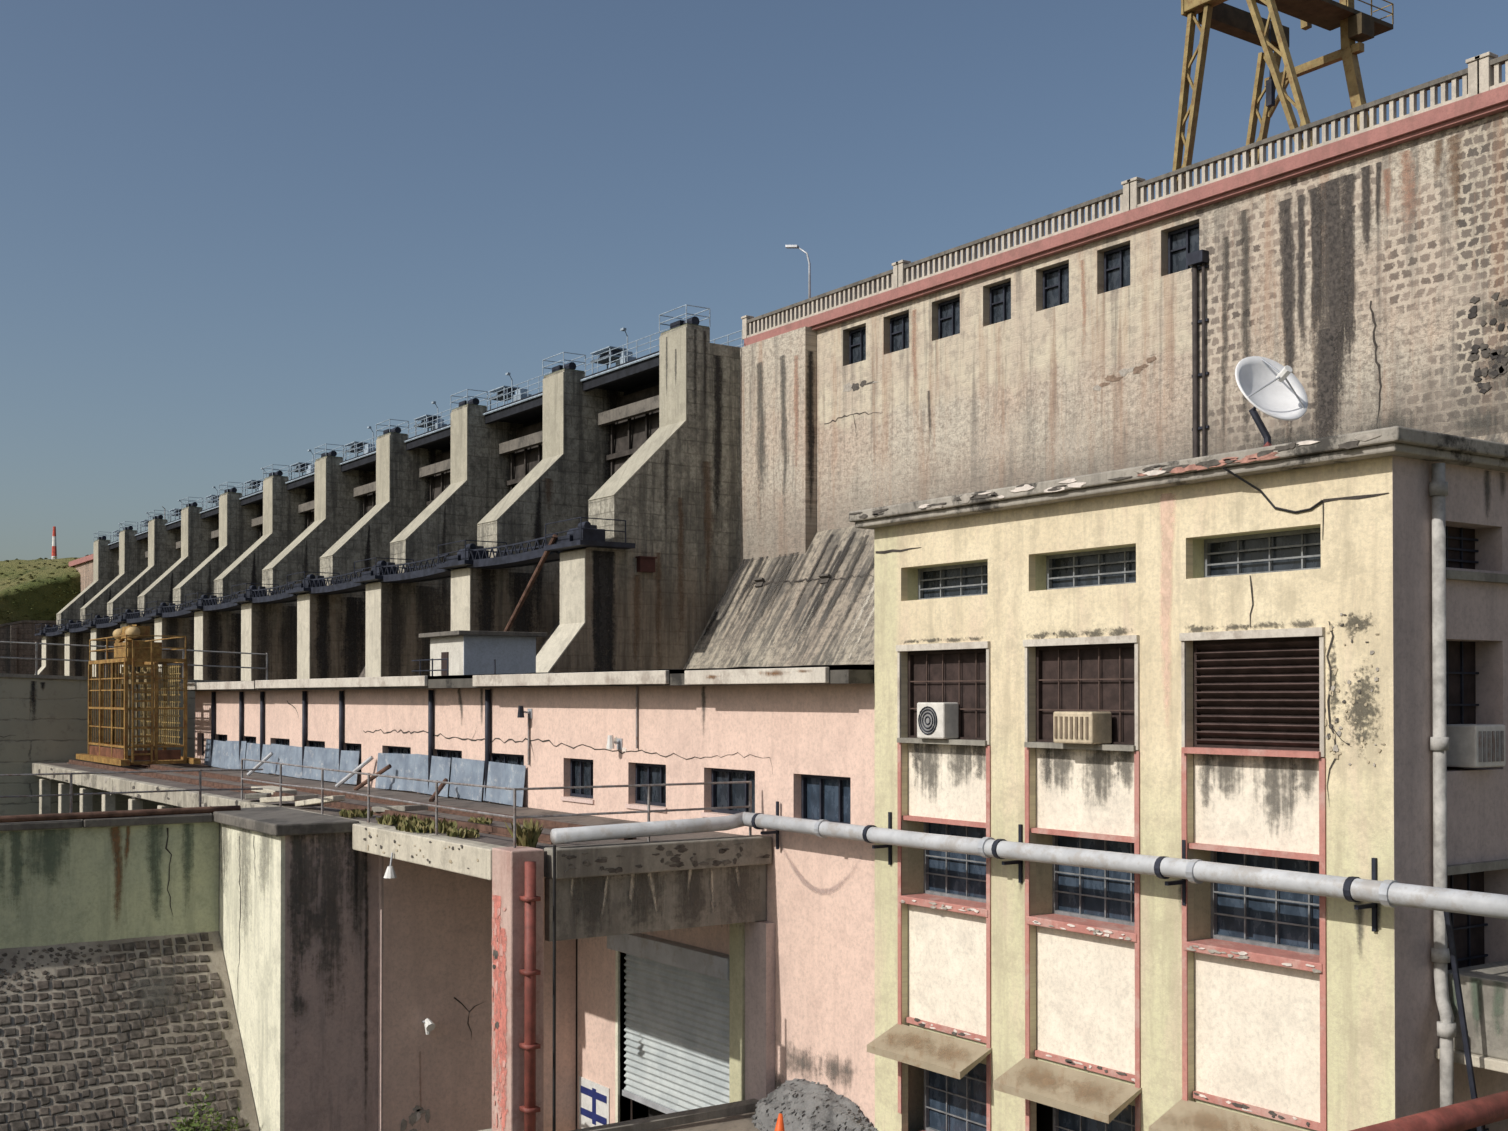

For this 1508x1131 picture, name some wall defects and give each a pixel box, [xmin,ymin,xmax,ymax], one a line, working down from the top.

water stain [1271,162,1381,445]
spalling [1467,292,1508,394]
crack [1322,493,1388,540]
water stain [1328,613,1379,742]
water stain [912,743,985,789]
water stain [1043,748,1132,798]
water stain [1201,754,1243,804]
water stain [1263,756,1316,824]
peeling [491,895,508,1131]